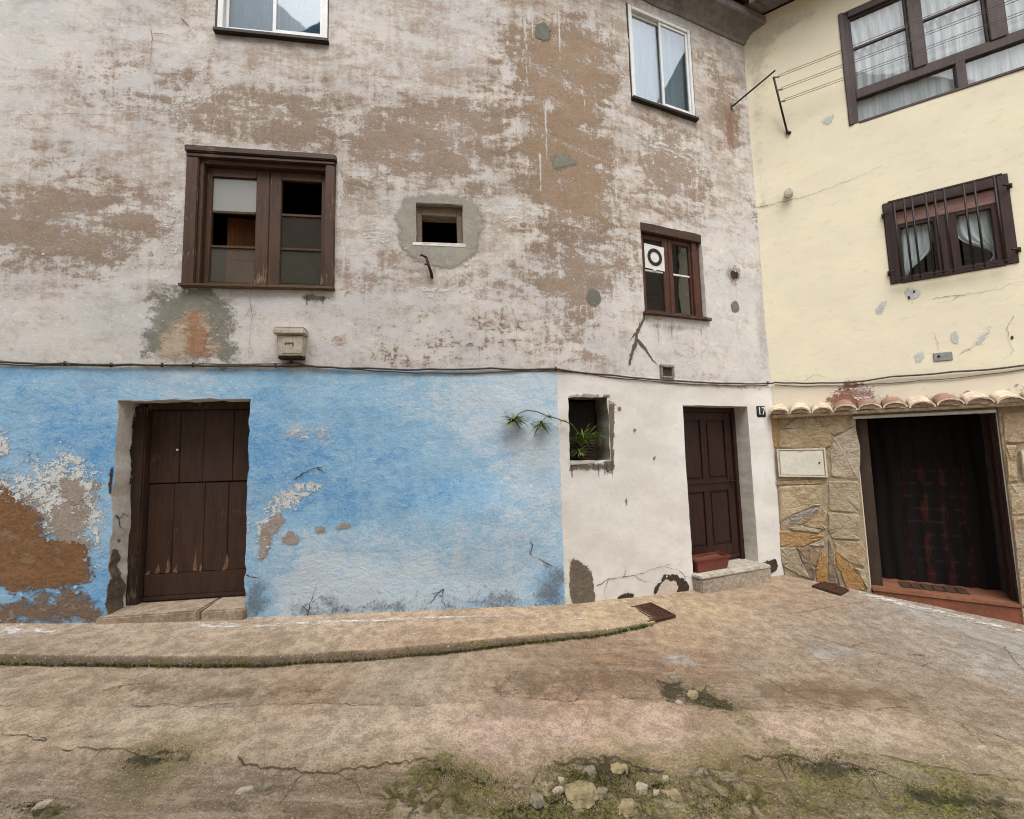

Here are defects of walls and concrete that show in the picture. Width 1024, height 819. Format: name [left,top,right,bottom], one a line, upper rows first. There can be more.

peeling [129,0,714,366]
peeling [0,170,172,280]
crack [629,314,657,365]
peeling [824,380,887,406]
peeling [0,429,126,624]
peeling [247,474,321,562]
spalling [569,558,596,604]
crack [597,563,690,593]
spalling [654,574,689,595]